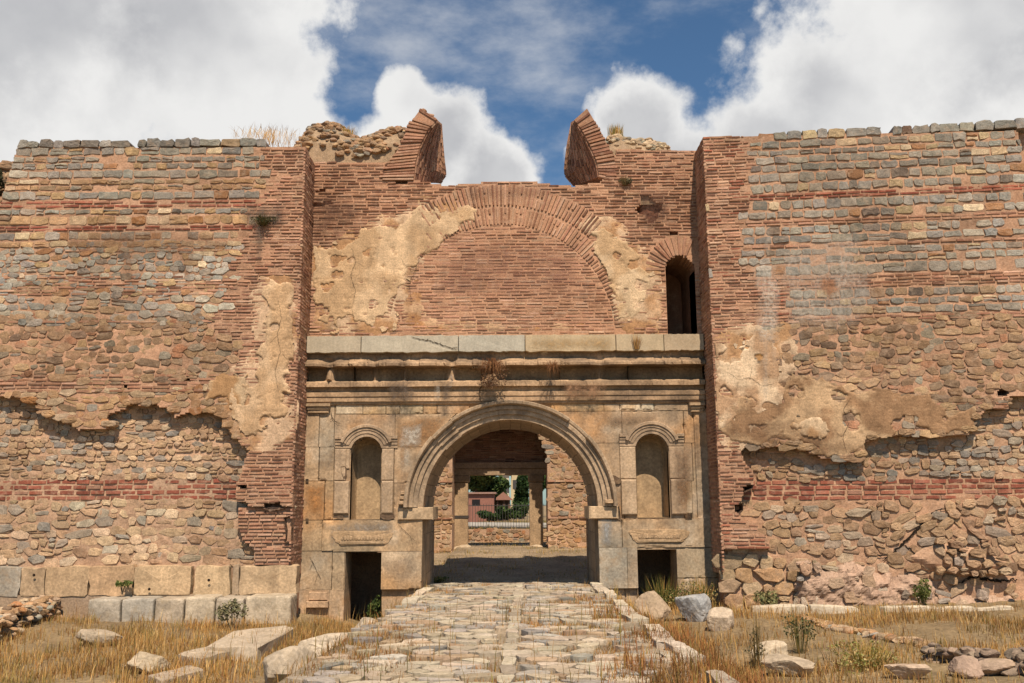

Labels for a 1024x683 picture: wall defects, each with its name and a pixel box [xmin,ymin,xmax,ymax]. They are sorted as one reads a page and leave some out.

peeling [203,196,584,452]
peeling [575,216,665,334]
peeling [20,396,55,418]
peeling [101,420,119,428]
peeling [714,321,994,461]
peeling [734,485,753,515]